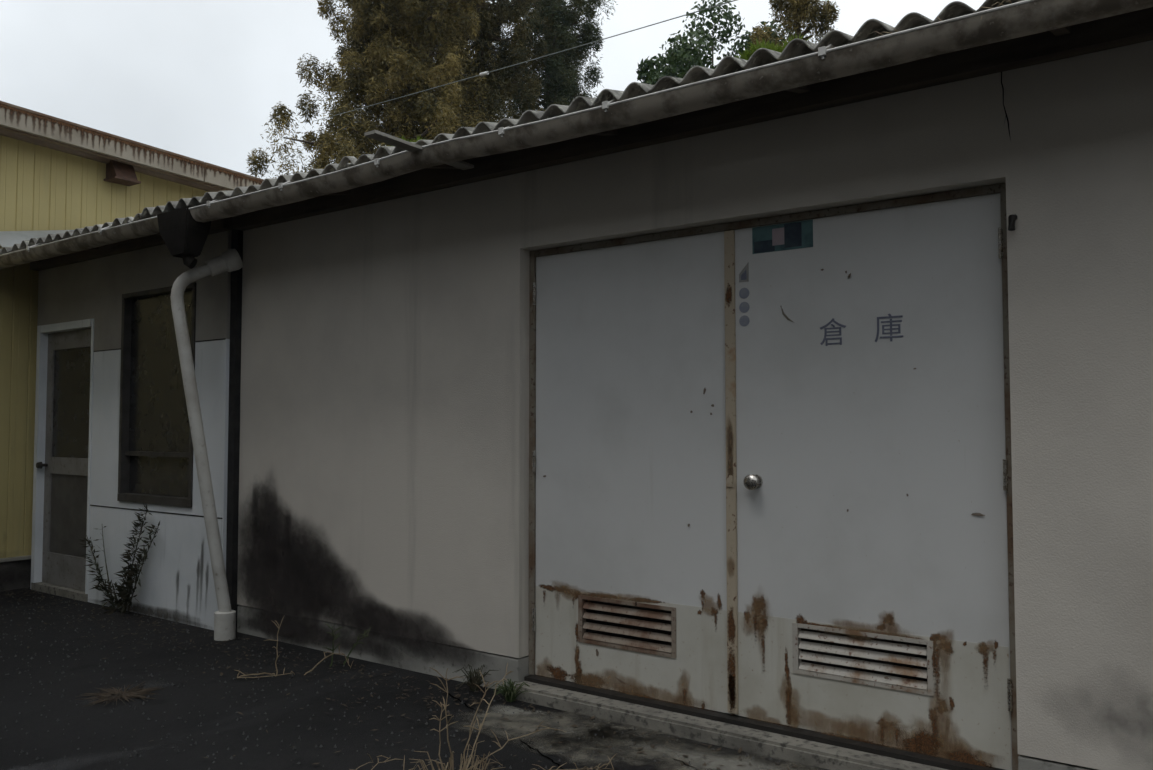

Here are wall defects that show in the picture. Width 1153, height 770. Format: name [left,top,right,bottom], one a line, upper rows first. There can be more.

corrosion [0,104,262,187]
crack [1001,72,1011,140]
water stain [240,491,471,660]
corrosion [538,623,714,712]
corrosion [698,589,768,708]
corrosion [750,614,998,768]